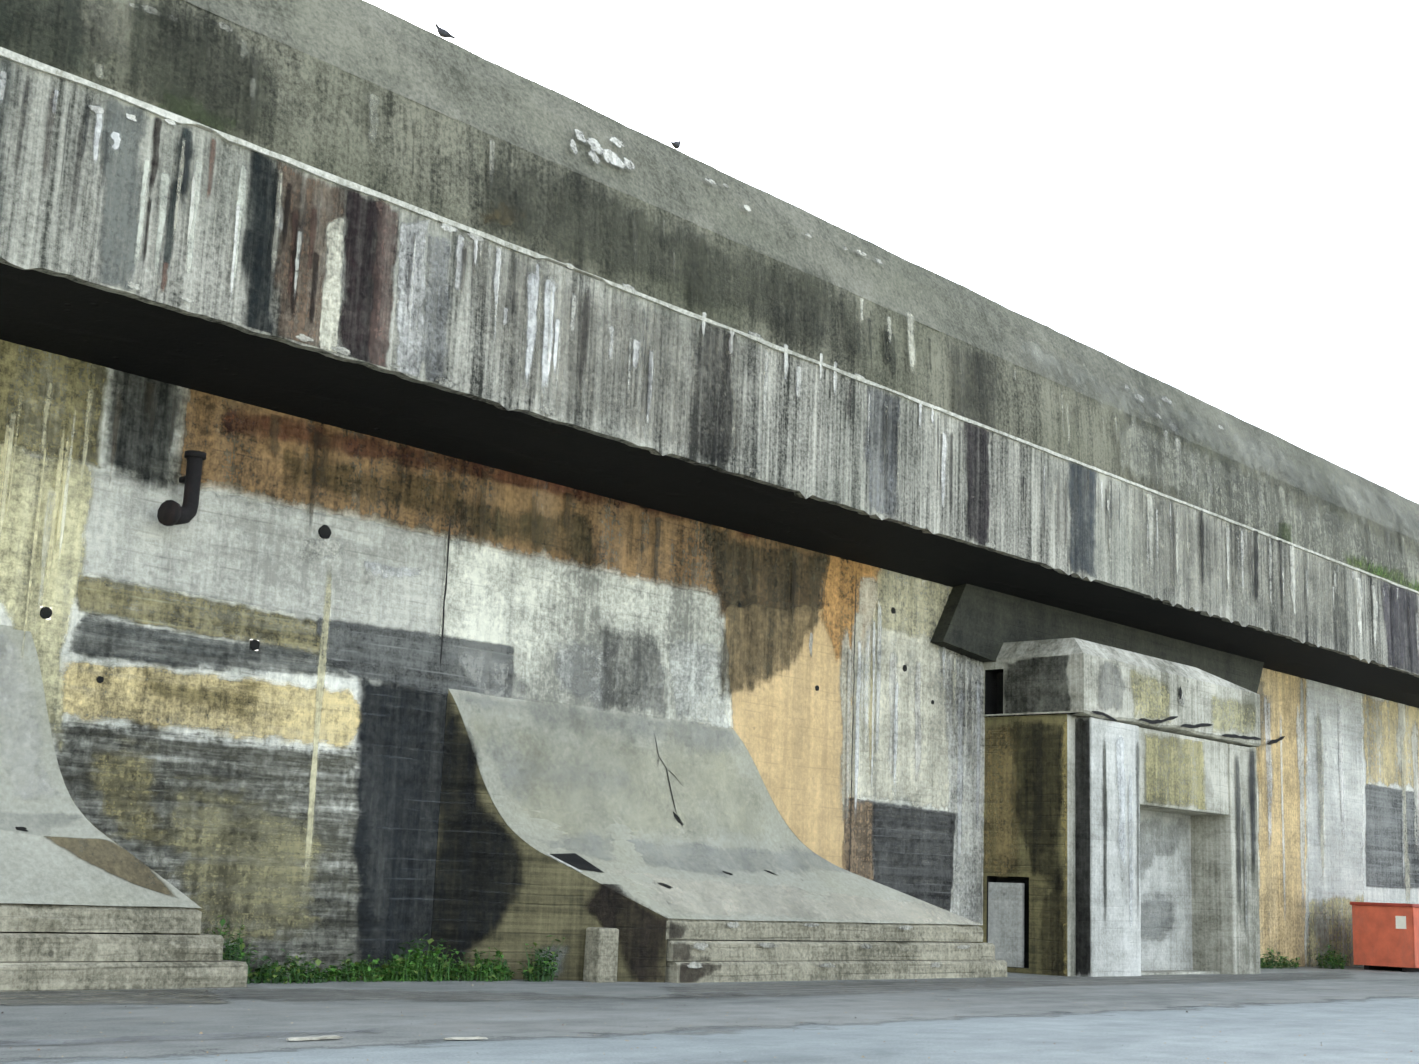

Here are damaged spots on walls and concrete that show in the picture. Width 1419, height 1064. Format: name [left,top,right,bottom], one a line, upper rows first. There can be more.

water stain [44,0,272,291]
rust [208,139,216,195]
water stain [231,150,344,353]
rust [275,161,398,367]
spalling [570,129,634,170]
water stain [0,370,527,979]
rust [179,389,881,881]
crack [654,734,682,817]
water stain [840,568,986,925]
water stain [1004,655,1173,976]
water stain [1044,393,1419,674]
water stain [1236,679,1419,966]